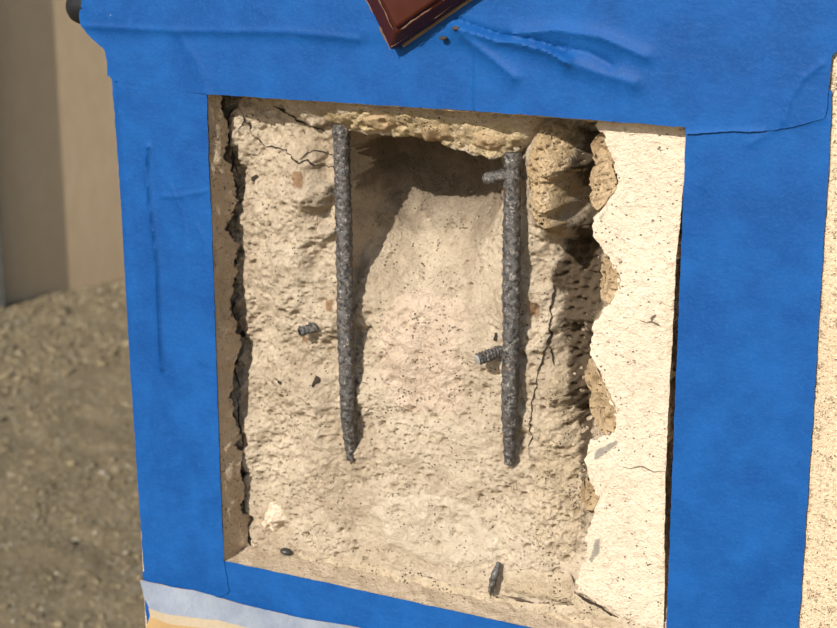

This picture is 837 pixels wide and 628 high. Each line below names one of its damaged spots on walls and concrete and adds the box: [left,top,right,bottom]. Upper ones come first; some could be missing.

crack [226,104,332,173]
spalling [589,132,618,211]
spalling [324,110,524,466]
damp [550,235,585,291]
spalling [600,255,621,304]
crack [528,285,556,457]
damp [571,376,588,424]
spalling [585,358,617,434]
spalling [580,475,600,513]